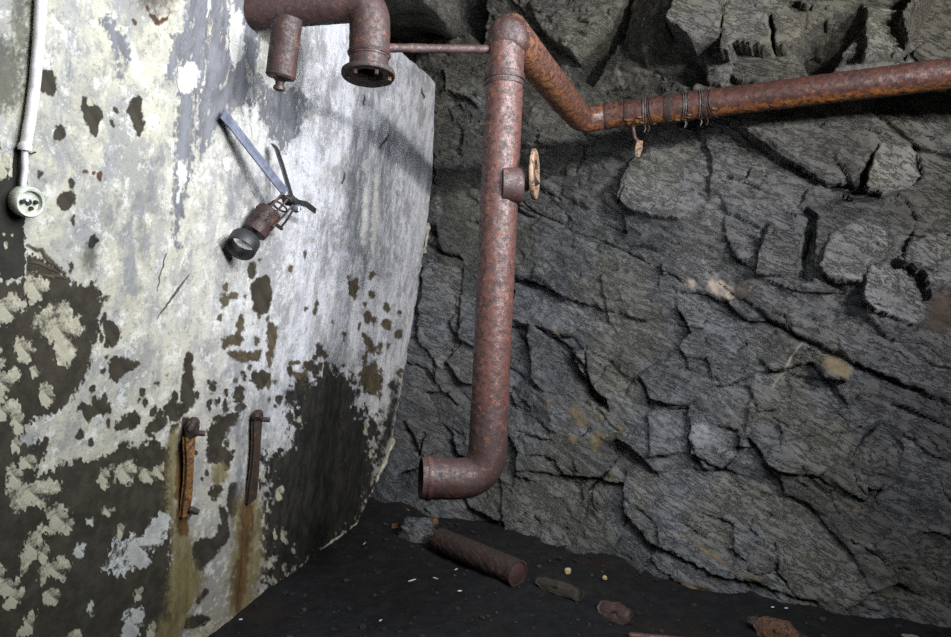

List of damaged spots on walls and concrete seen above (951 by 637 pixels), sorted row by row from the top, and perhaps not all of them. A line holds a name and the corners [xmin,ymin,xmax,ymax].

spalling [40,70,57,96]
spalling [57,178,76,225]
spalling [81,95,146,137]
crack [518,170,688,285]
crack [728,109,951,198]
spalling [347,271,403,395]
crack [517,327,630,406]
crack [719,283,951,406]
peeling [0,244,278,637]
leakage [258,342,404,591]
rust [154,430,206,637]
rust [213,448,263,616]